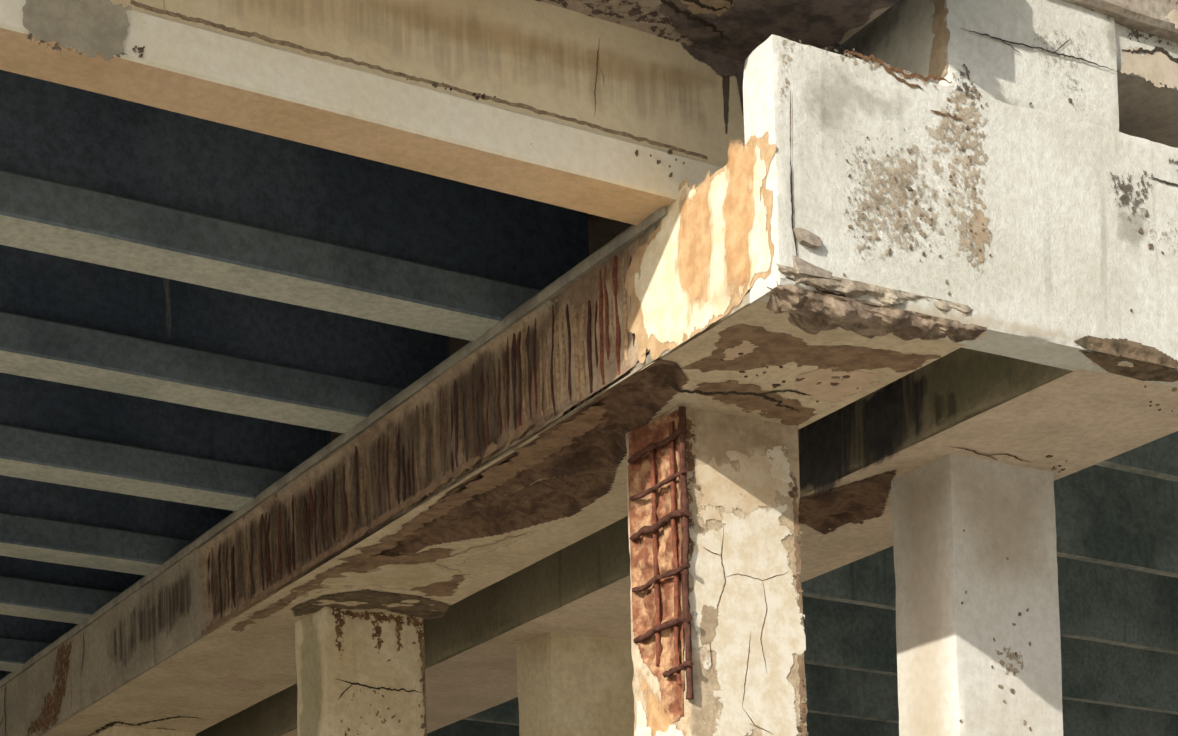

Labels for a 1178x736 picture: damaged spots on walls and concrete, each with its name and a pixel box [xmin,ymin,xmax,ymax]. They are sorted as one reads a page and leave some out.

spalling [1121,45,1178,90]
crack [1149,177,1178,186]
spalling [131,0,993,736]
crack [657,376,810,412]
leakage [208,328,543,619]
rust [231,398,609,632]
rust [332,607,424,655]
crack [703,526,787,733]
rust [27,642,72,736]
crack [337,679,423,699]
crack [88,716,200,736]